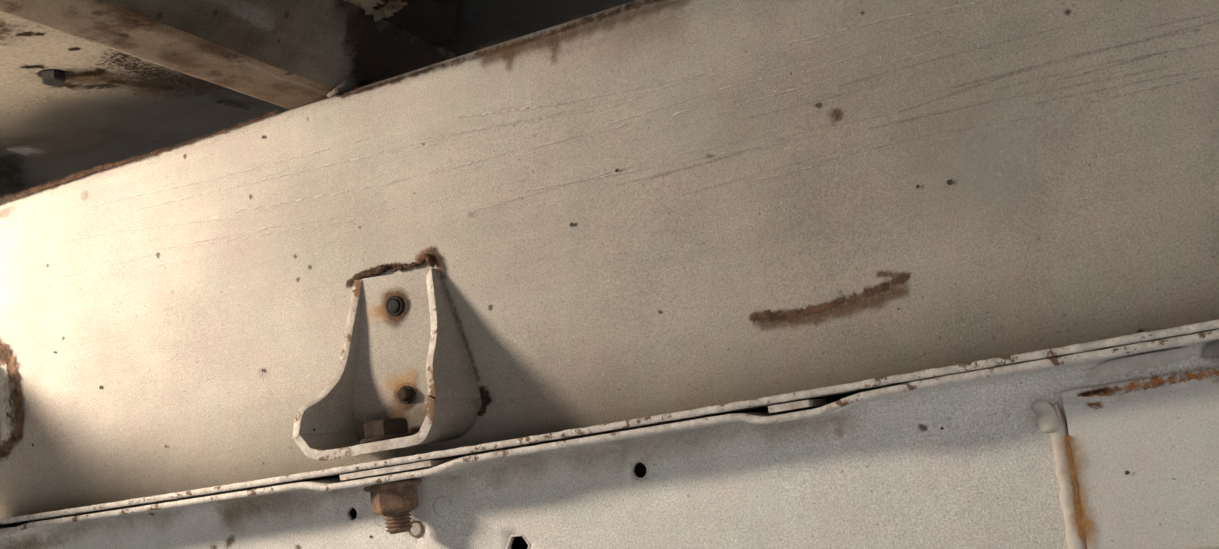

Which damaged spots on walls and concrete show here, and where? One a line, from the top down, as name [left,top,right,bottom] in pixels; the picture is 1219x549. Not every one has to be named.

water stain [0,155,28,204]
corrosion [346,246,449,293]
corrosion [750,272,910,327]
corrosion [0,343,24,458]
corrosion [454,310,492,416]
corrosion [1063,369,1219,409]
corrosion [1065,436,1089,538]